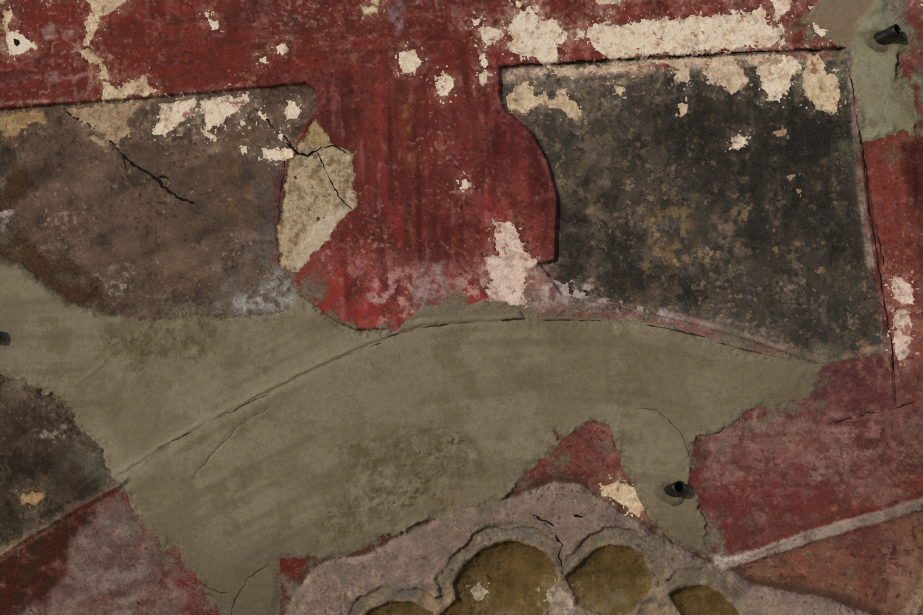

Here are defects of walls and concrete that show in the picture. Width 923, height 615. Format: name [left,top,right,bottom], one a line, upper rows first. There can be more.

peeling [464,0,846,124]
crack [505,47,846,67]
crack [65,111,194,204]
spalling [0,0,358,272]
crack [254,108,352,210]
peeling [478,218,542,315]
crack [836,75,914,423]
crack [501,315,600,323]
crack [648,325,789,359]
peeling [883,270,919,375]